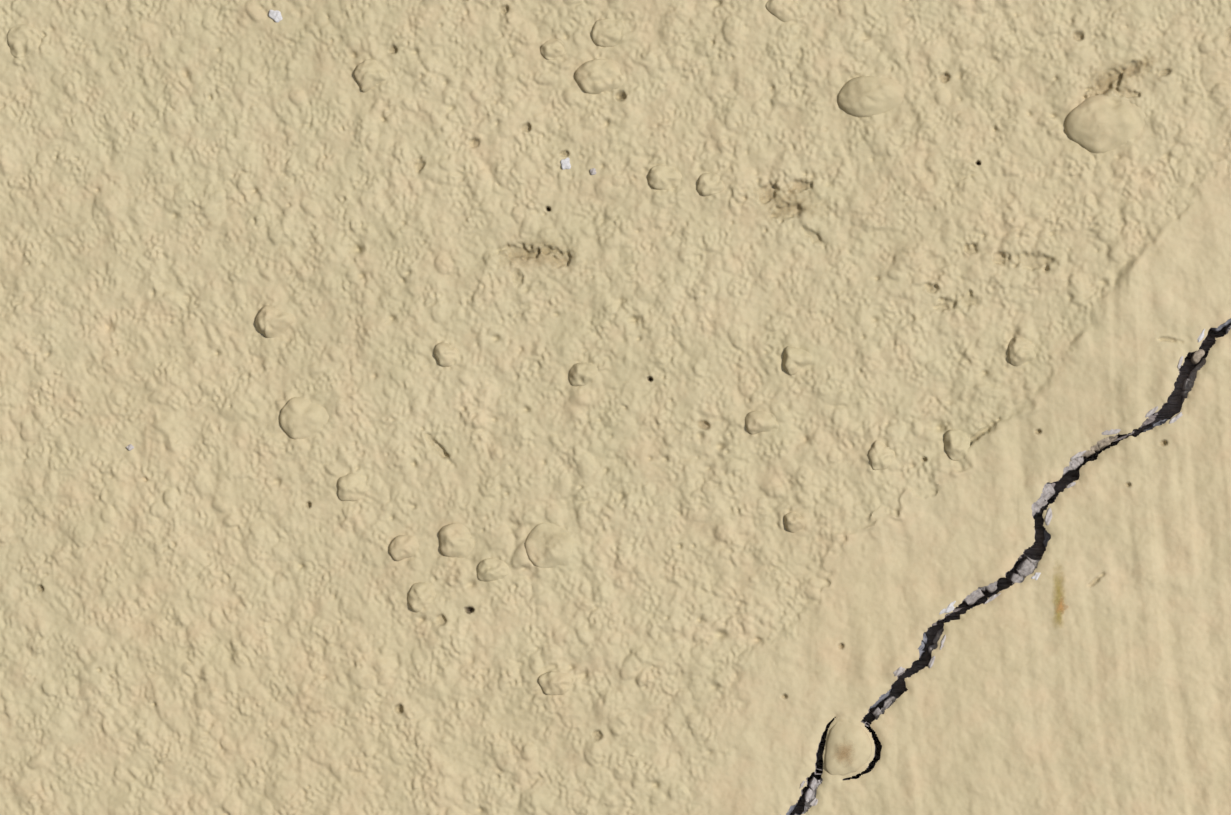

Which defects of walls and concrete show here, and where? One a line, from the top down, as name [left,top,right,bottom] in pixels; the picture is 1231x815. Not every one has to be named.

crack [780,318,1231,815]